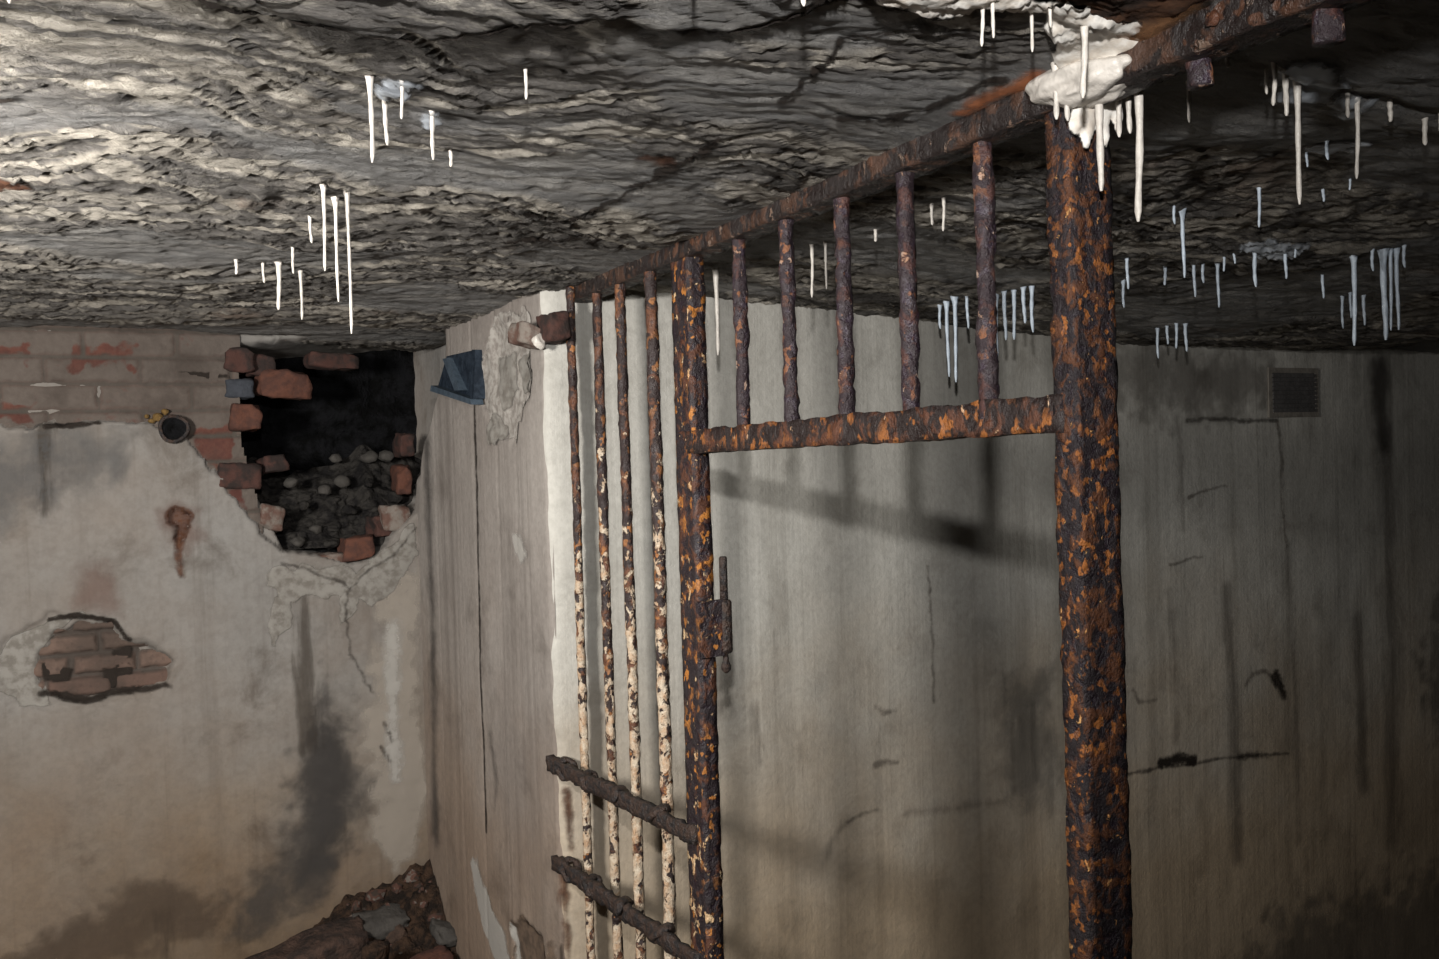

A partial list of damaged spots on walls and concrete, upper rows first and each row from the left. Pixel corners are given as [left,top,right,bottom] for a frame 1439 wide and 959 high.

rust [1057,0,1205,42]
rust [955,71,1042,116]
flaking render [0,325,421,647]
flaking render [0,611,171,707]
crack [1142,752,1280,773]
damp [248,724,358,932]
rust [562,788,573,833]
rust [558,874,570,949]